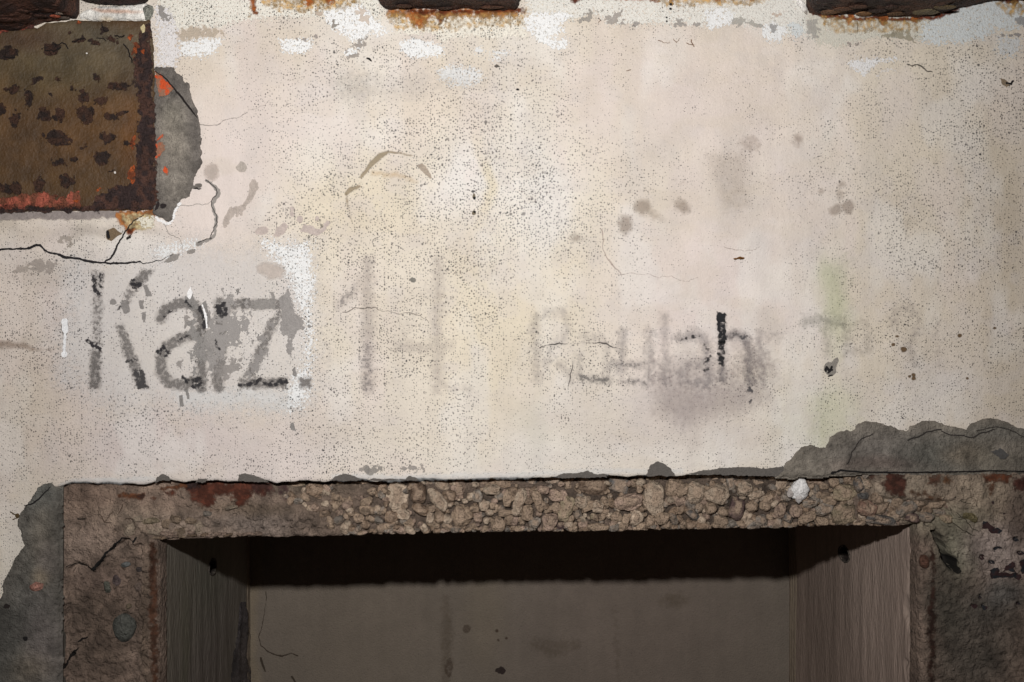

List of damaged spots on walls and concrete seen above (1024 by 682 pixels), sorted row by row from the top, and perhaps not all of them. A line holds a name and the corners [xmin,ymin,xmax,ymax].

corrosion [50,12,119,45]
corrosion [387,4,521,30]
corrosion [812,5,959,32]
corrosion [0,22,159,234]
peeling [140,0,1024,225]
crack [0,179,221,265]
crack [66,504,137,571]
spalling [123,510,263,540]
corrosion [118,480,289,507]
flaking render [238,473,268,482]
spalling [283,418,1024,535]
flaking render [0,483,64,682]